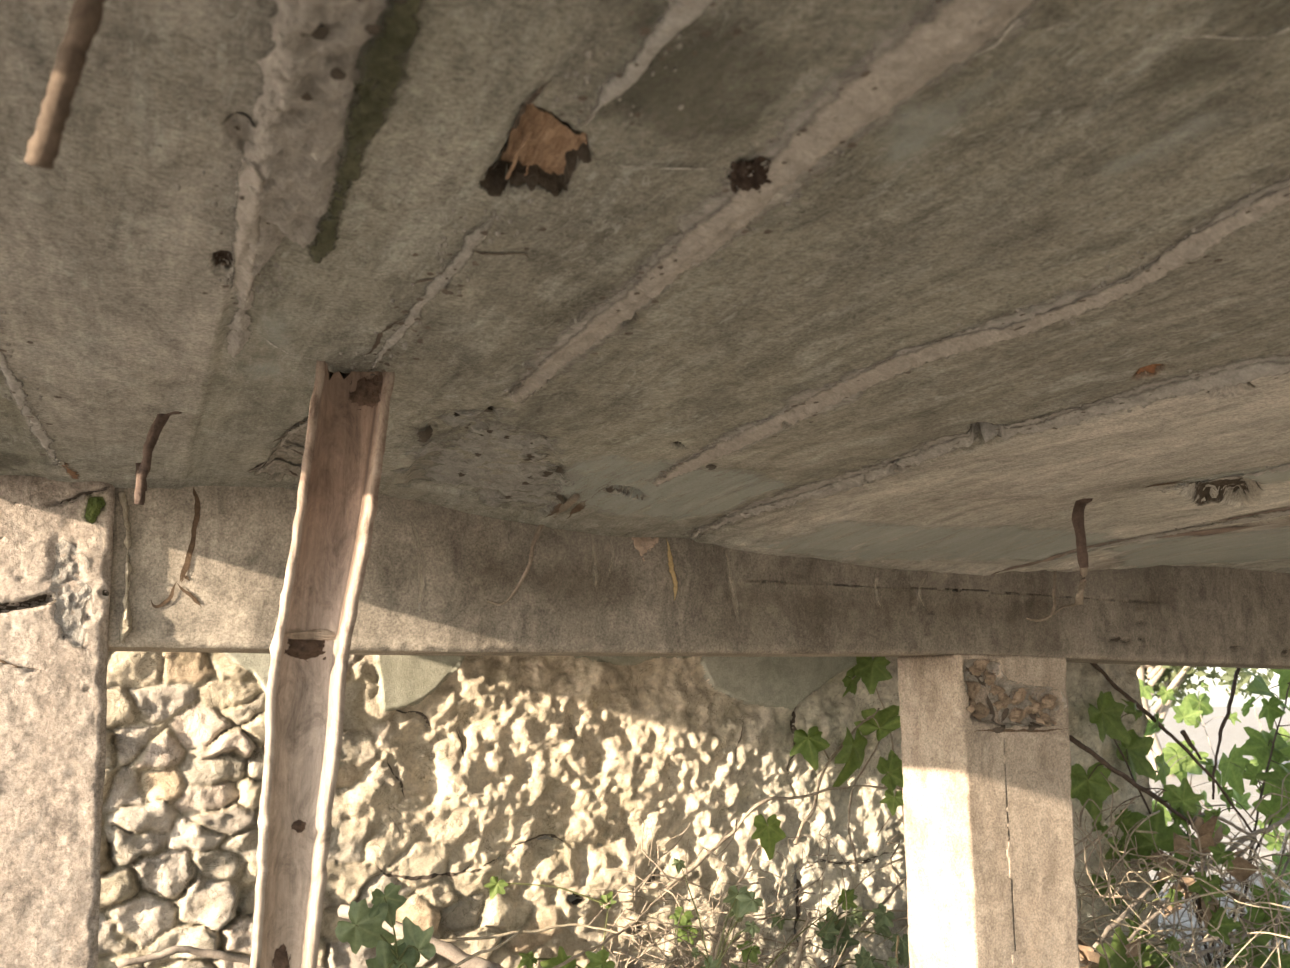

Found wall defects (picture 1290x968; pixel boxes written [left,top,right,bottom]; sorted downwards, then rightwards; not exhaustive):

water stain [642,51,719,125]
spalling [479,76,592,197]
rust [728,156,772,194]
spalling [212,250,233,268]
spalling [1143,478,1260,506]
crack [0,659,41,671]
spalling [963,659,1068,733]